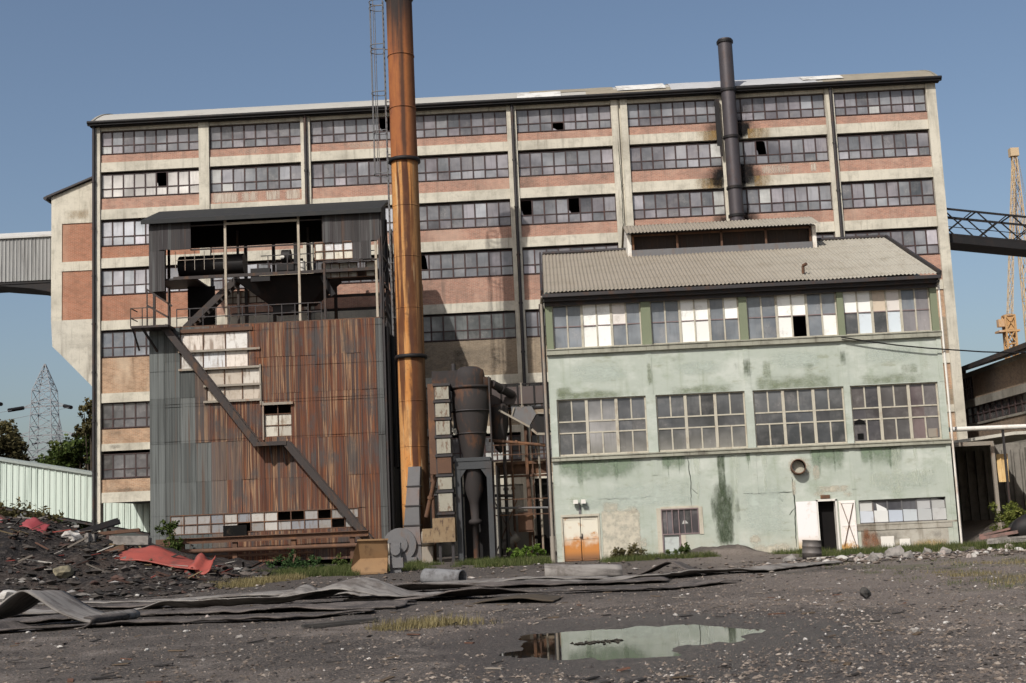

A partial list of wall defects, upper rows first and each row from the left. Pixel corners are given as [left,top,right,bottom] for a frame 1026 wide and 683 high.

damp [715,453,765,543]